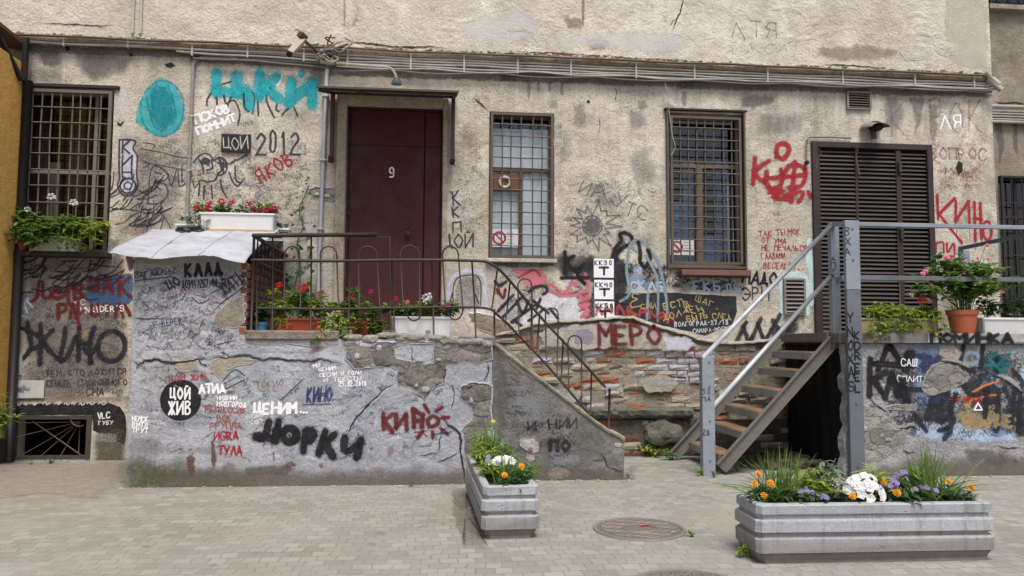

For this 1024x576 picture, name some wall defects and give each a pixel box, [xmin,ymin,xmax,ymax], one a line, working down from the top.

spalling [213,296,246,329]
spalling [175,355,257,379]
crack [132,348,345,402]
spalling [245,311,822,420]
spalling [922,344,968,396]
crack [346,347,489,480]